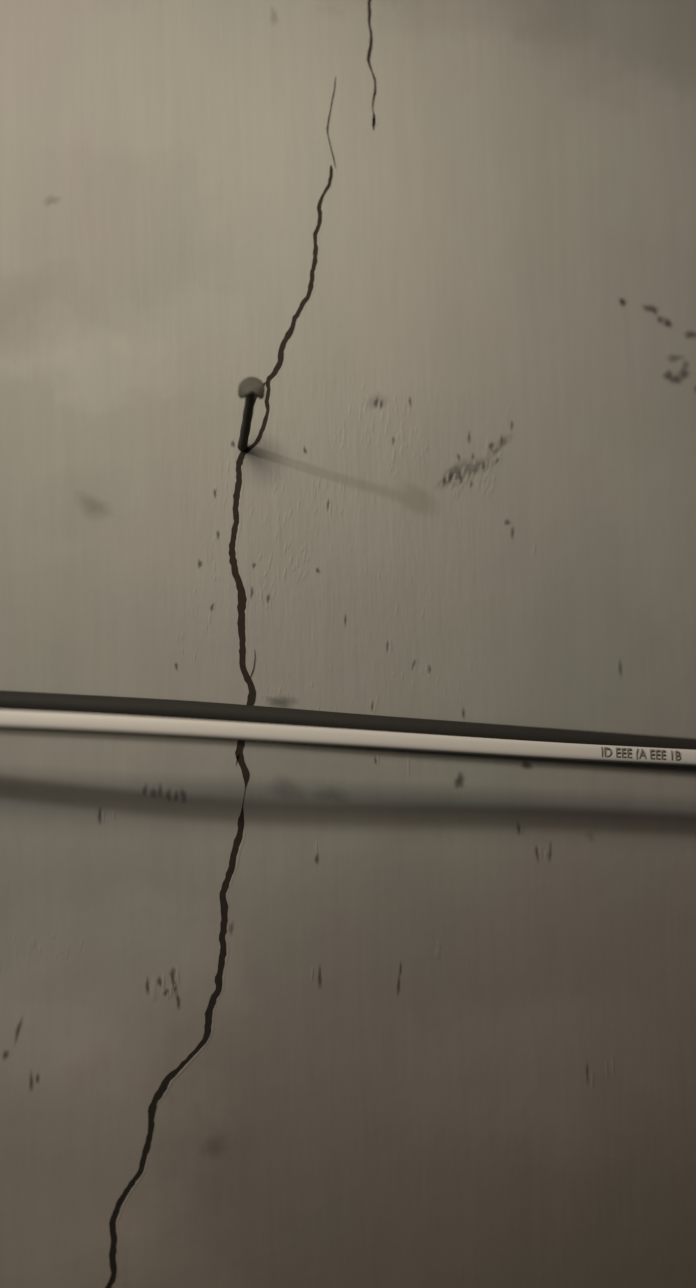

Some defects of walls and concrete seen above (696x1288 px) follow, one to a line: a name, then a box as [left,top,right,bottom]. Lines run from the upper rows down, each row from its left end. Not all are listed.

crack [367,0,378,131]
crack [229,77,336,706]
crack [105,740,250,1288]